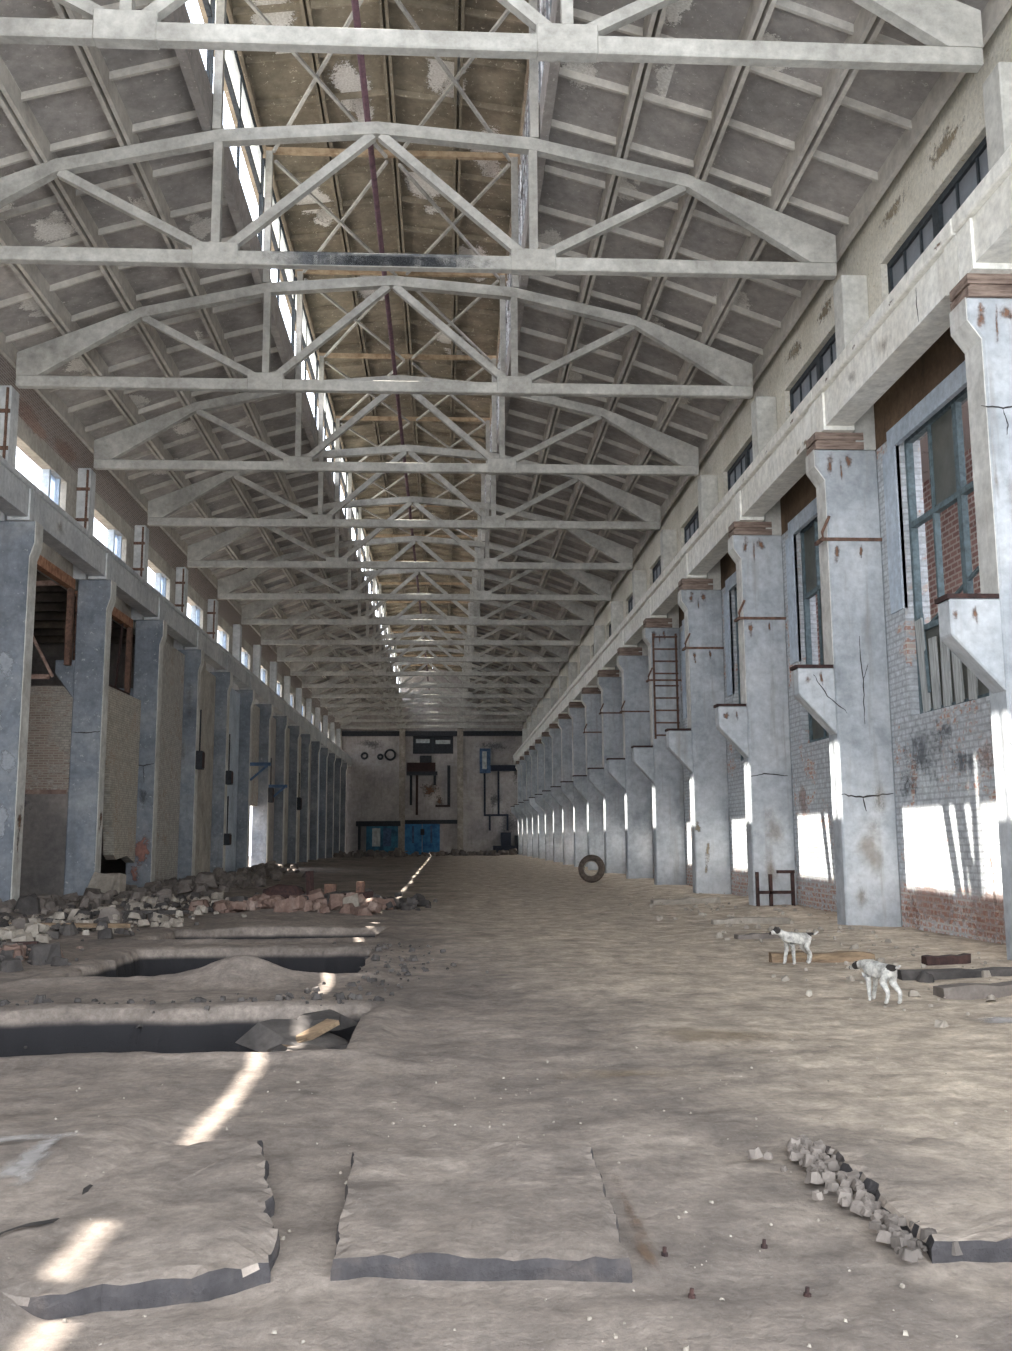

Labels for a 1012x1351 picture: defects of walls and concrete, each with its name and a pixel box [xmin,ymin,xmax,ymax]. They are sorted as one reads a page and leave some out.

peeling [31,210,77,244]
rust [978,303,1012,335]